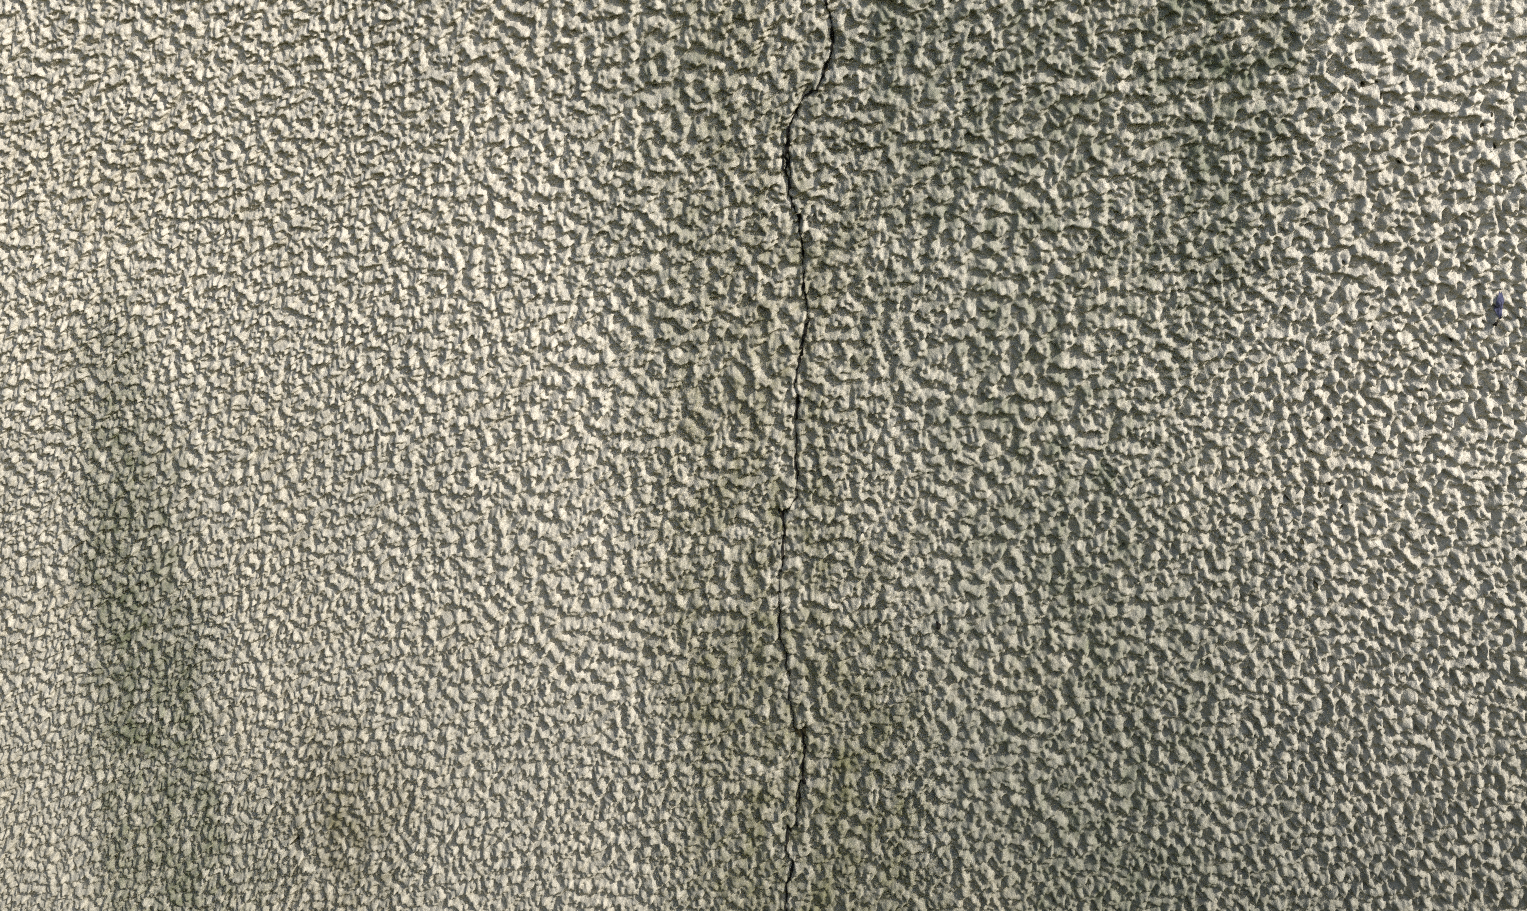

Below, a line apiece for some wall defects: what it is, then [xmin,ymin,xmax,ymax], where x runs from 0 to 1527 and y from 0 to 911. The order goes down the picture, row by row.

crack [778,0,834,911]